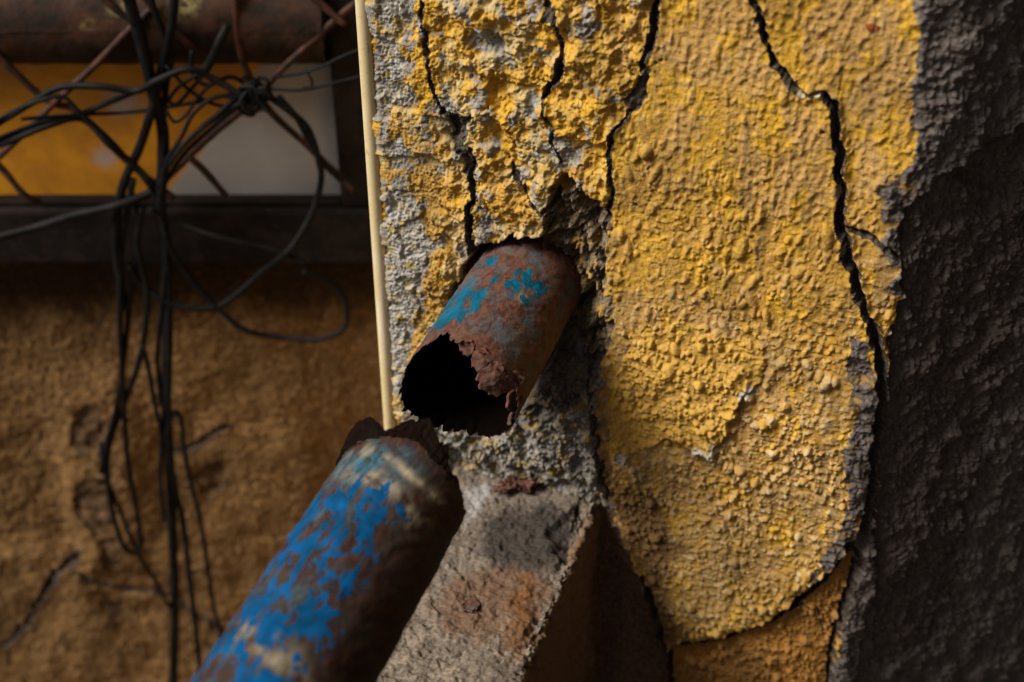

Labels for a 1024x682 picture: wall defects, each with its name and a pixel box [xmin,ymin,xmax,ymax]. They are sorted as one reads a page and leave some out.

crack [418,0,467,118]
crack [540,14,565,164]
crack [639,0,661,74]
crack [464,147,479,256]
crack [508,156,554,219]
crack [602,108,634,229]
peeling [382,190,436,391]
flaking render [435,124,767,510]
crack [656,0,901,682]
flaking render [810,123,1024,669]